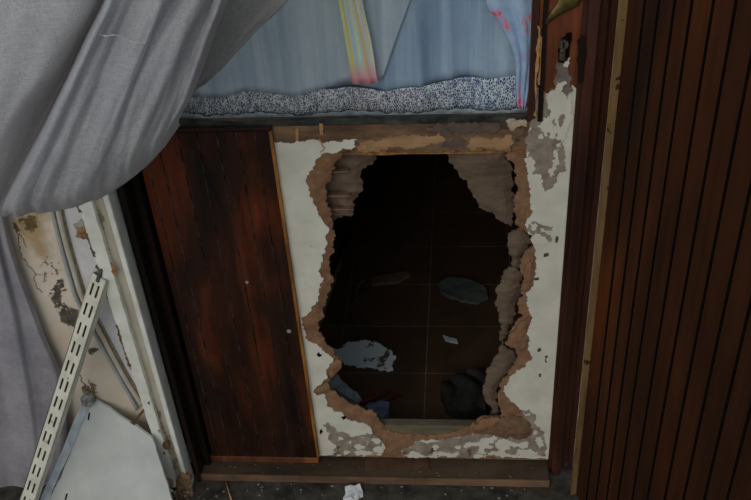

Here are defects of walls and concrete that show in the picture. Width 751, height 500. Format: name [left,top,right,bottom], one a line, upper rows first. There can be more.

peeling [524,58,574,191]
crack [13,222,43,293]
peeling [530,223,558,257]
peeling [320,423,384,457]
peeling [400,409,547,459]